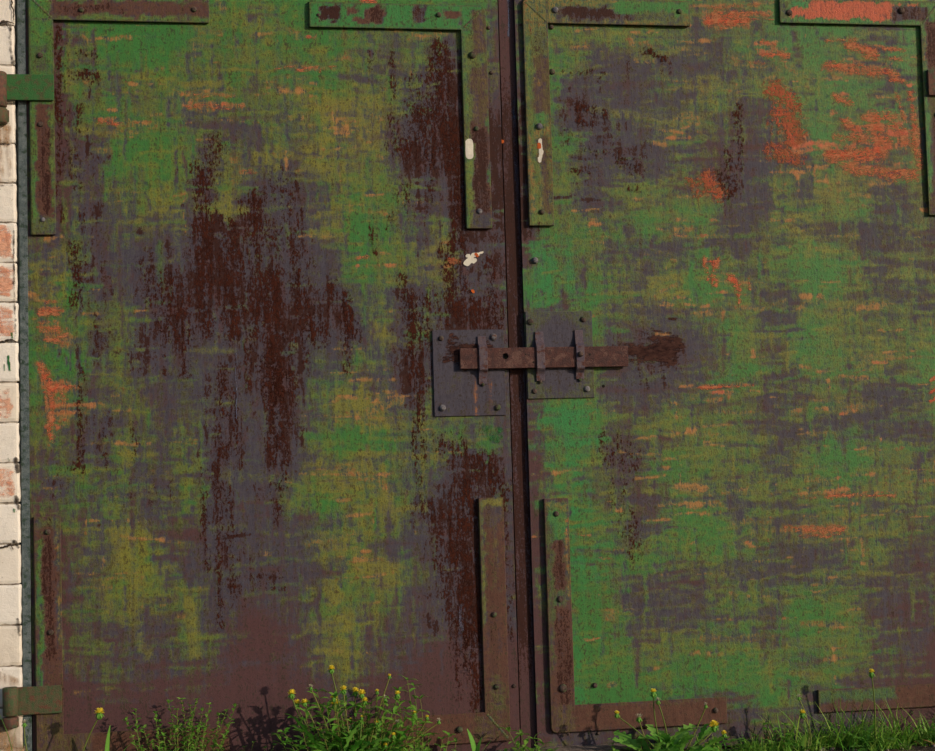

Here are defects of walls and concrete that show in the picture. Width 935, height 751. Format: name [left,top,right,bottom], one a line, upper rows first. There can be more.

peeling [0,225,16,336]
peeling [0,457,21,510]